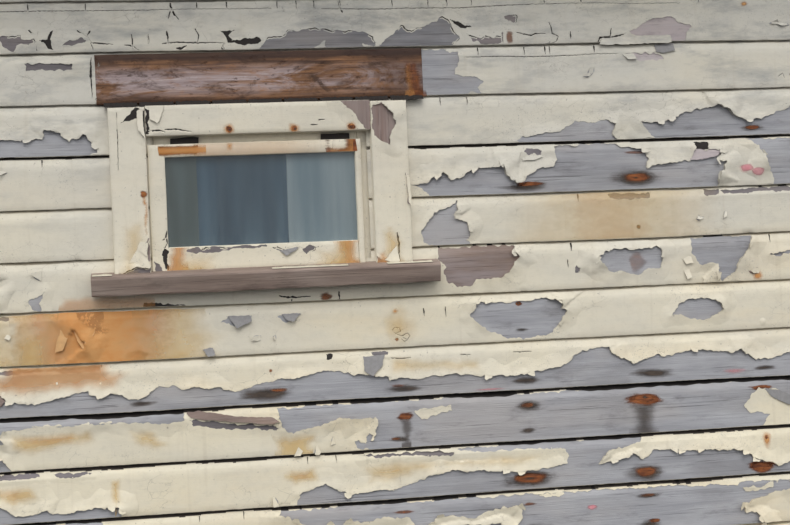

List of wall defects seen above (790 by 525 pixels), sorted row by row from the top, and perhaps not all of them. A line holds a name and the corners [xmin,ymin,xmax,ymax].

peeling [0,25,92,82]
peeling [600,9,698,70]
peeling [114,106,164,147]
peeling [327,100,407,158]
rust [510,182,543,190]
rust [617,171,653,185]
peeling [405,89,790,341]
rust [3,309,162,388]
peeling [0,233,790,525]
rust [626,394,661,433]
rust [507,472,549,485]
rust [749,461,775,473]